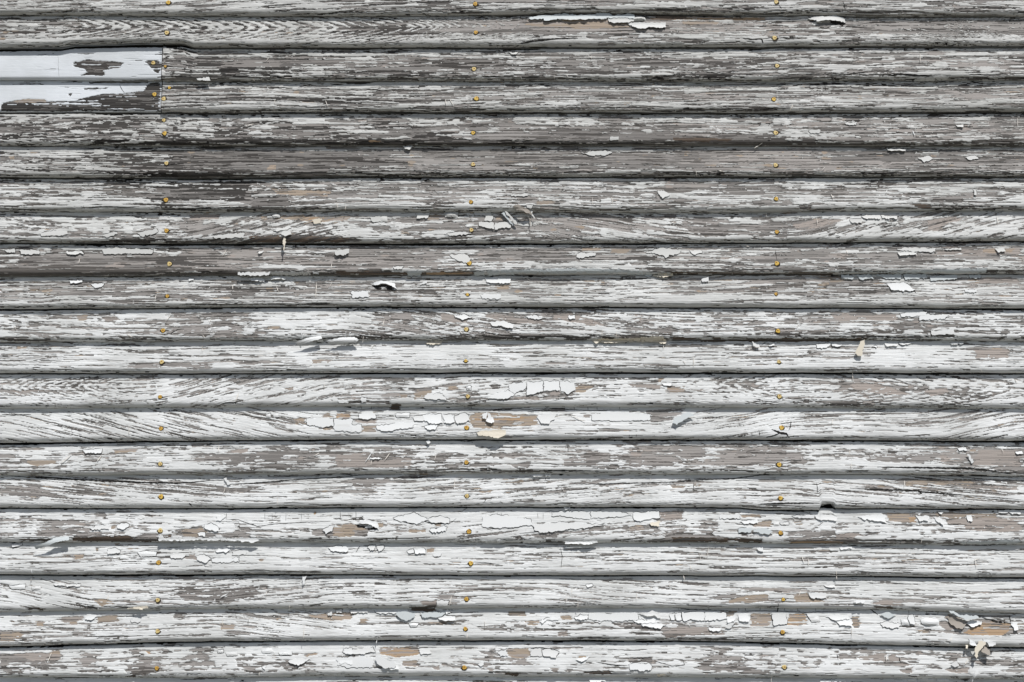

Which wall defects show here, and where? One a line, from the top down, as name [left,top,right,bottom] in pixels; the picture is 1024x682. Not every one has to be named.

peeling [80,61,136,83]
peeling [12,99,72,111]
peeling [322,411,352,420]
peeling [754,608,1024,682]